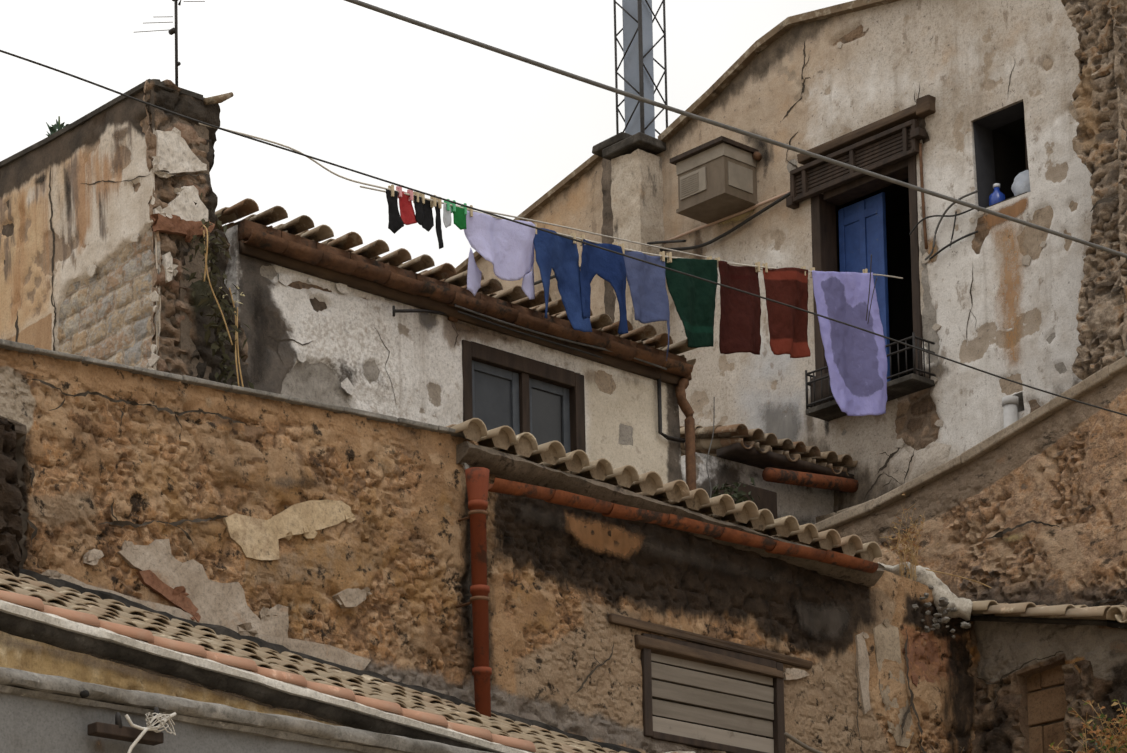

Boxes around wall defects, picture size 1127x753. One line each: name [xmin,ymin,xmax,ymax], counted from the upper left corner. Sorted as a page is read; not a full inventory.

crack [783,41,810,168]
crack [80,170,208,191]
crack [48,168,57,351]
peeling [148,291,159,312]
peeling [148,344,160,370]
flaking render [895,206,944,450]
flaking render [969,211,991,254]
rust [983,198,1028,361]
flaking render [1008,206,1053,266]
crack [31,379,244,440]
crack [864,440,915,500]
damp [795,603,850,639]